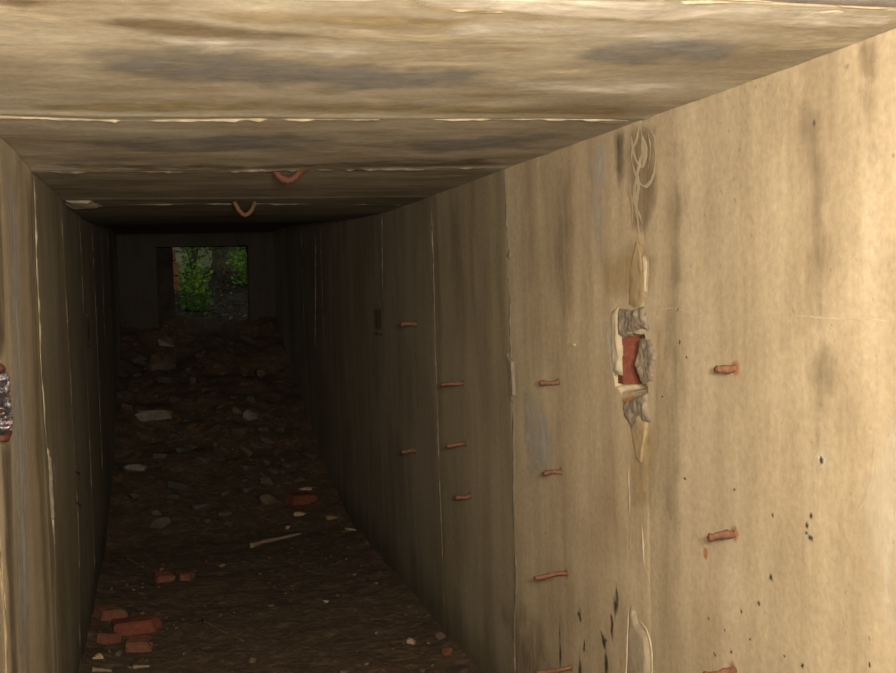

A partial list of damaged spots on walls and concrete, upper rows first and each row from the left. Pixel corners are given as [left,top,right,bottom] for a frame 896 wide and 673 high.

spalling [608,236,657,497]
corrosion [714,364,738,374]
corrosion [704,529,737,558]
corrosion [703,665,737,673]